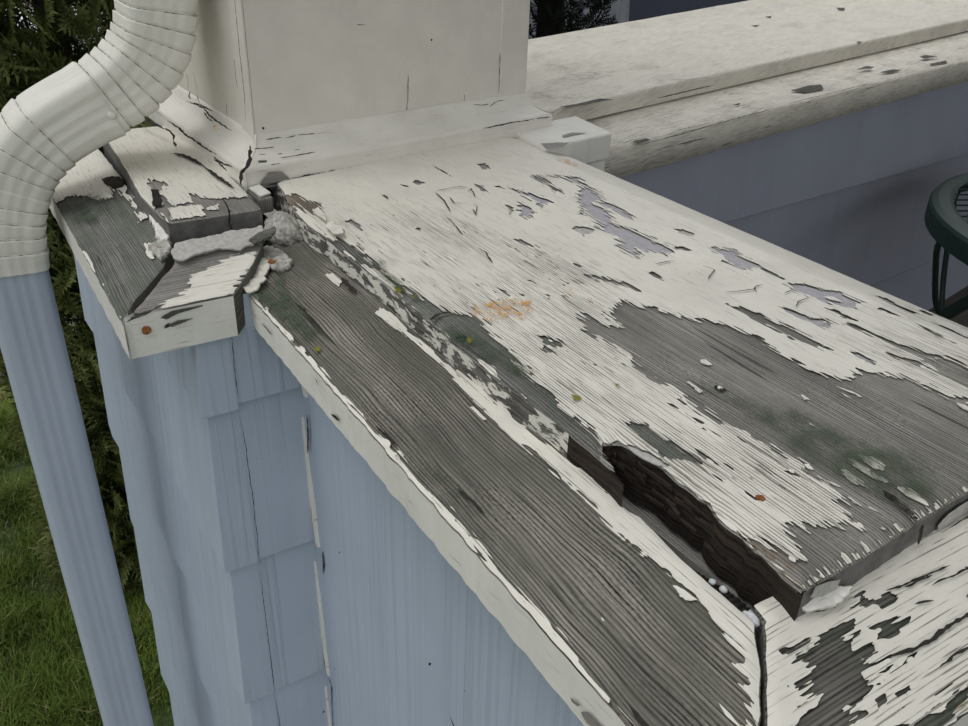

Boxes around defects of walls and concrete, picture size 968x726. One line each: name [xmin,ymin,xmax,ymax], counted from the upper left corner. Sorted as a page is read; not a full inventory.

crack [186,6,246,130]
peeling [791,84,823,92]
peeling [147,180,261,224]
crack [144,120,335,230]
peeling [258,160,290,188]
peeling [287,195,322,215]
peeling [507,176,688,258]
peeling [712,245,864,350]
peeling [329,238,613,471]
peeling [577,301,968,598]
peeling [779,592,918,726]
peeling [914,684,968,726]